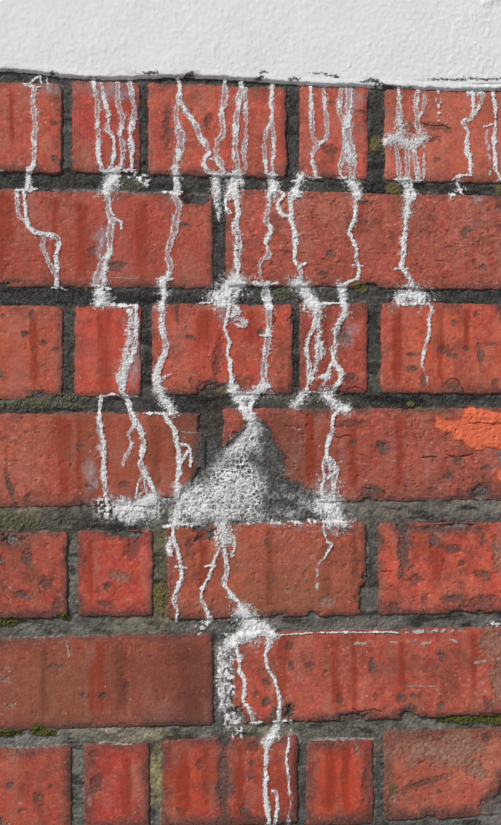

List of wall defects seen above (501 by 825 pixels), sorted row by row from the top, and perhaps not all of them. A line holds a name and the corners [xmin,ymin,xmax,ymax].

leakage [15,71,65,290]
leakage [90,70,501,825]